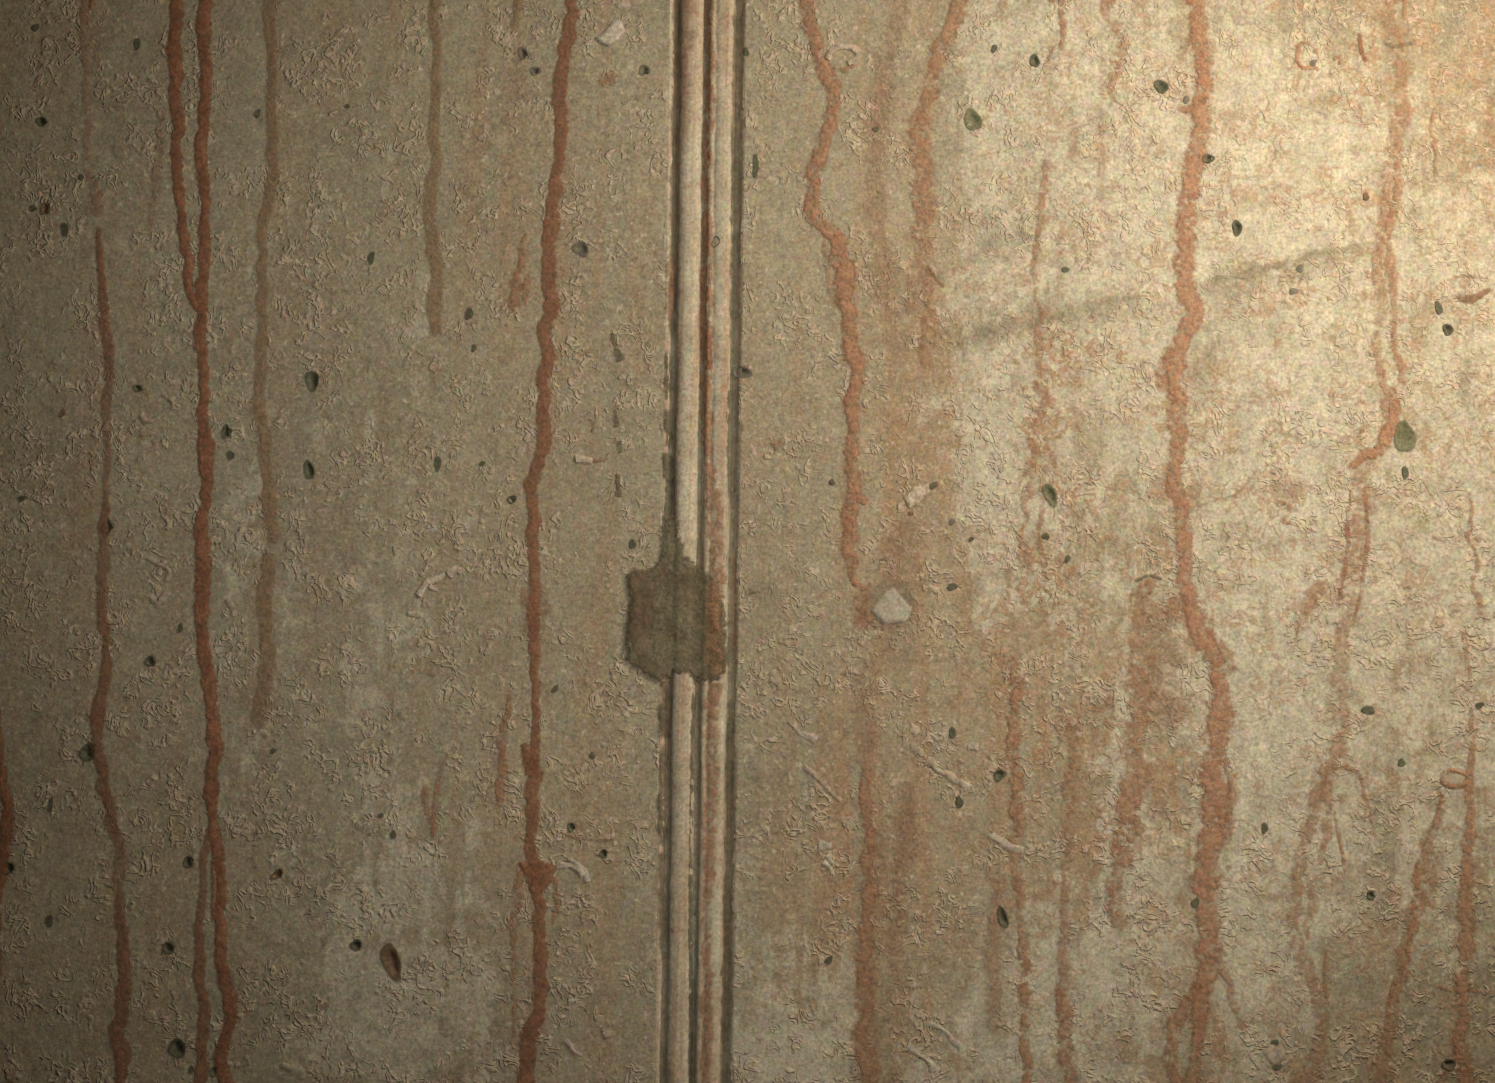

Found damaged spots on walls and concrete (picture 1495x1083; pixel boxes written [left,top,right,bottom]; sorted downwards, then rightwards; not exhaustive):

corrosion [96,231,114,385]
corrosion [253,5,278,714]
corrosion [800,0,873,624]
corrosion [1350,328,1405,468]
corrosion [0,709,14,935]
corrosion [90,589,118,836]
corrosion [166,0,238,1083]
corrosion [495,0,579,1083]
damp [625,515,730,681]
corrosion [1156,0,1236,1083]
corrosion [1305,494,1370,612]
corrosion [109,903,132,1083]